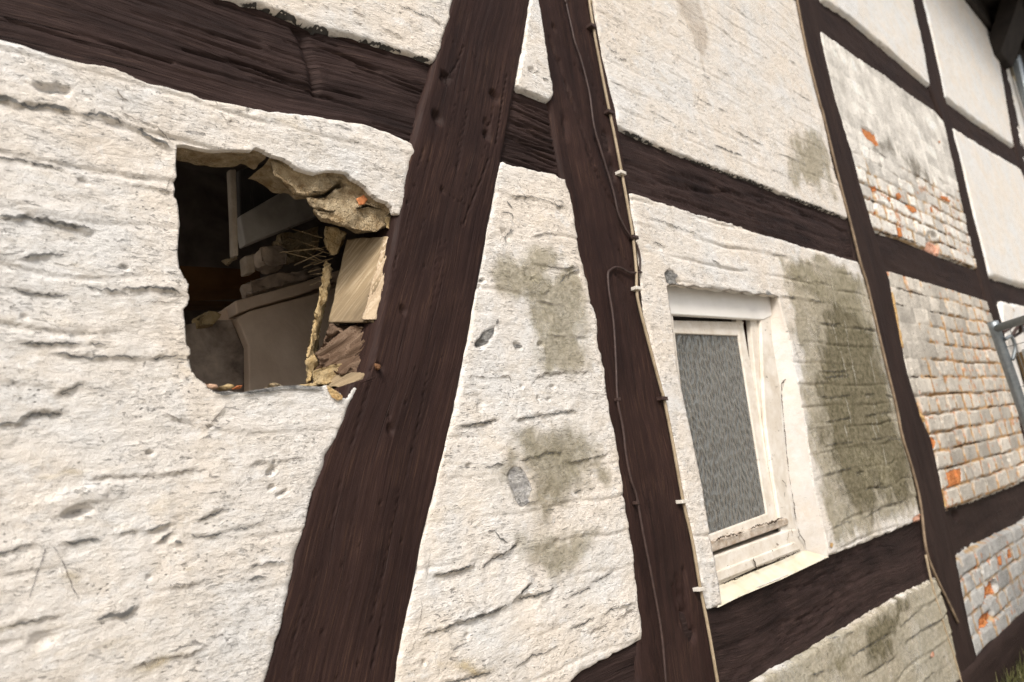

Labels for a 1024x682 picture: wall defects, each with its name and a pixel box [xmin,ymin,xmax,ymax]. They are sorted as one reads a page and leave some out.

damp [792,132,831,186]
spalling [861,128,879,146]
spalling [176,148,391,400]
spalling [923,242,939,256]
damp [495,248,583,371]
damp [786,255,918,548]
spalling [508,467,532,506]
damp [522,429,587,508]
spalling [946,468,961,488]
spalling [978,581,994,630]